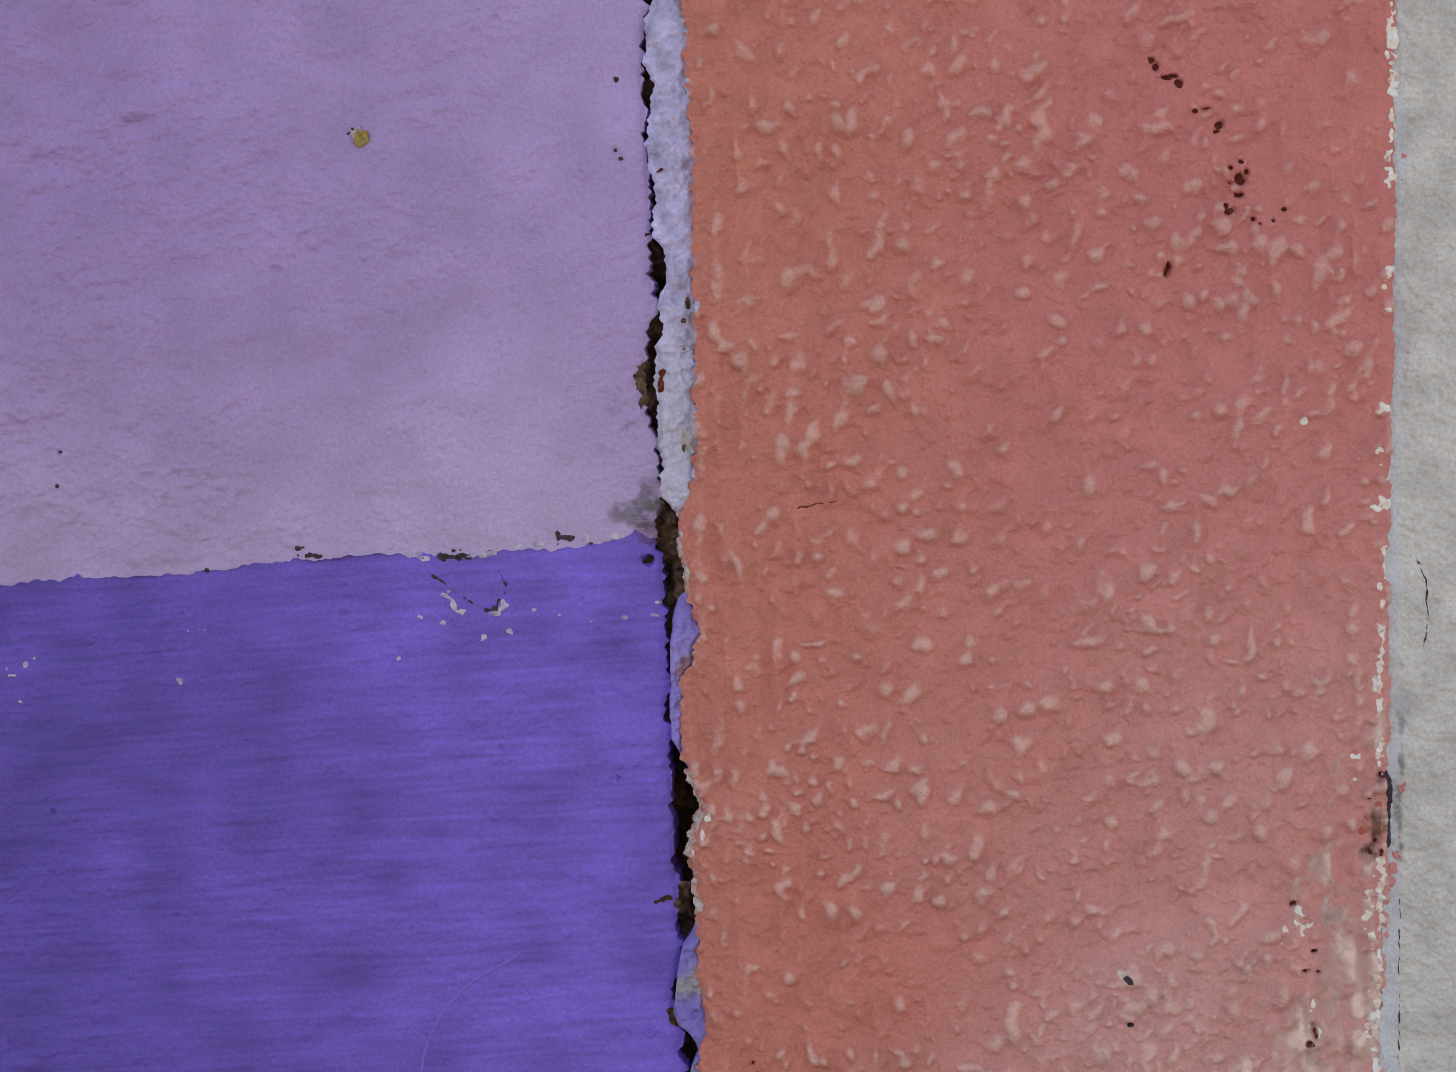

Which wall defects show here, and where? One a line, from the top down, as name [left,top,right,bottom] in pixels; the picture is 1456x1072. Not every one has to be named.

crack [633,63,667,434]
spalling [642,0,701,518]
peeling [295,546,323,561]
peeling [413,549,513,635]
peeling [516,531,619,549]
crack [797,500,838,509]
peeling [1370,447,1391,512]
crack [643,497,711,948]
spalling [670,592,701,766]
peeling [1350,545,1393,1072]
crack [666,1007,698,1072]
spalling [673,914,707,1072]